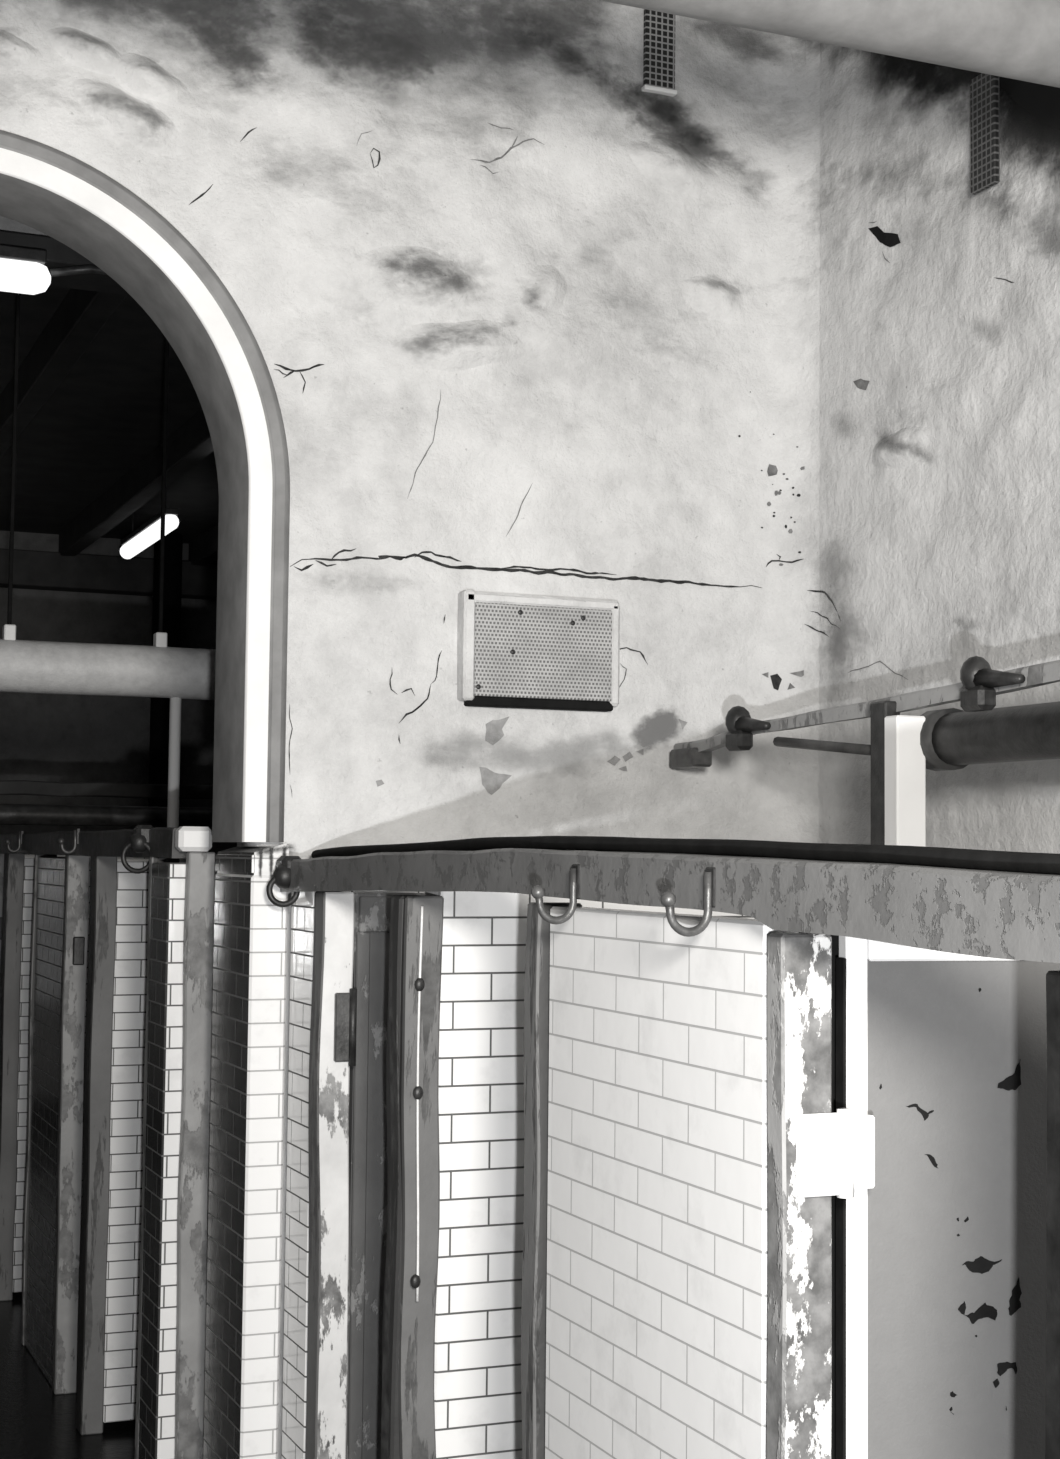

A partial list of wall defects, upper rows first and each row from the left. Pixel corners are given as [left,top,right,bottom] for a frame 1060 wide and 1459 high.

water stain [884,55,950,100]
crack [290,486,841,637]
crack [848,661,908,680]
peeling [998,1062,1021,1091]
peeling [963,1256,1002,1274]
peeling [958,1278,1022,1337]